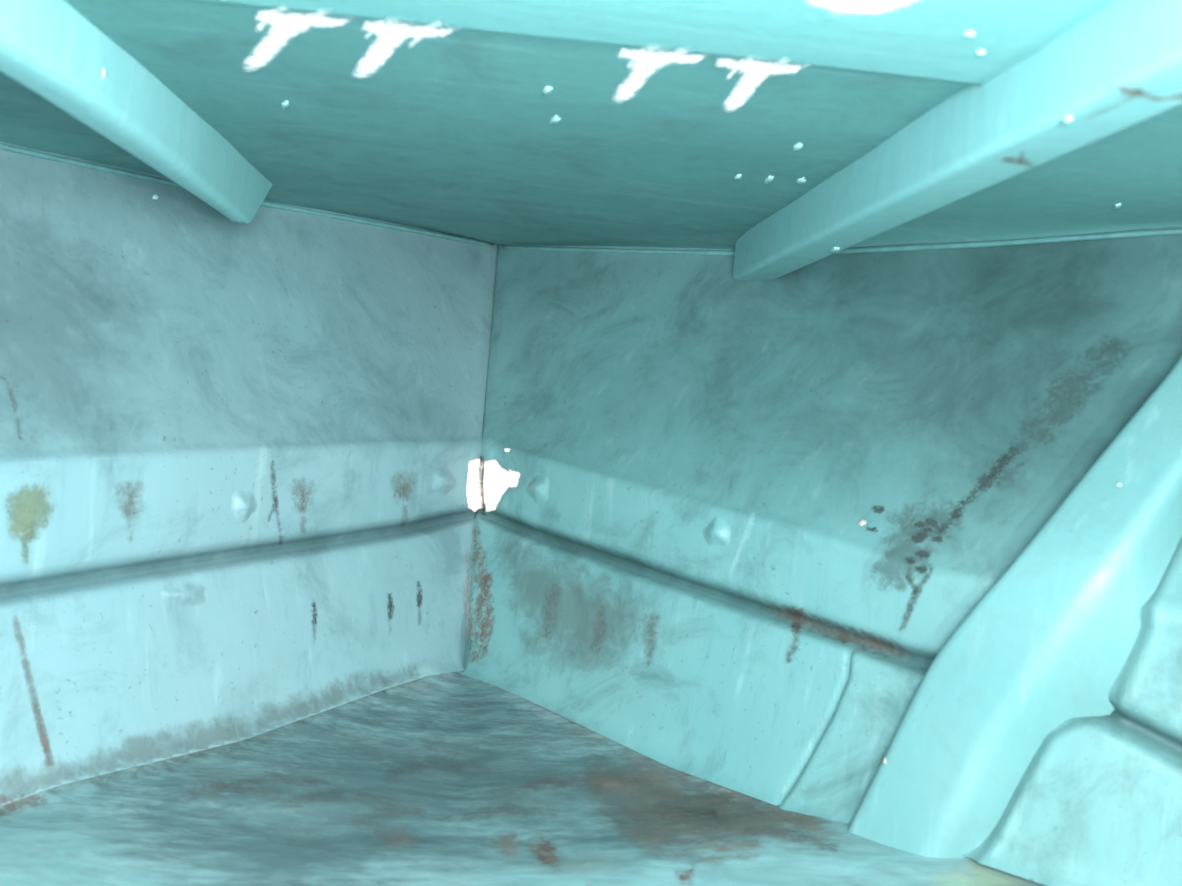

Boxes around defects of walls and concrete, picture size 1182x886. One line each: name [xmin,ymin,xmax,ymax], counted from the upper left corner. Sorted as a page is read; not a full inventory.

crack [1120,87,1182,101]
spalling [466,448,520,513]
damp [10,488,50,562]
rust [472,531,493,661]
rust [777,609,905,662]